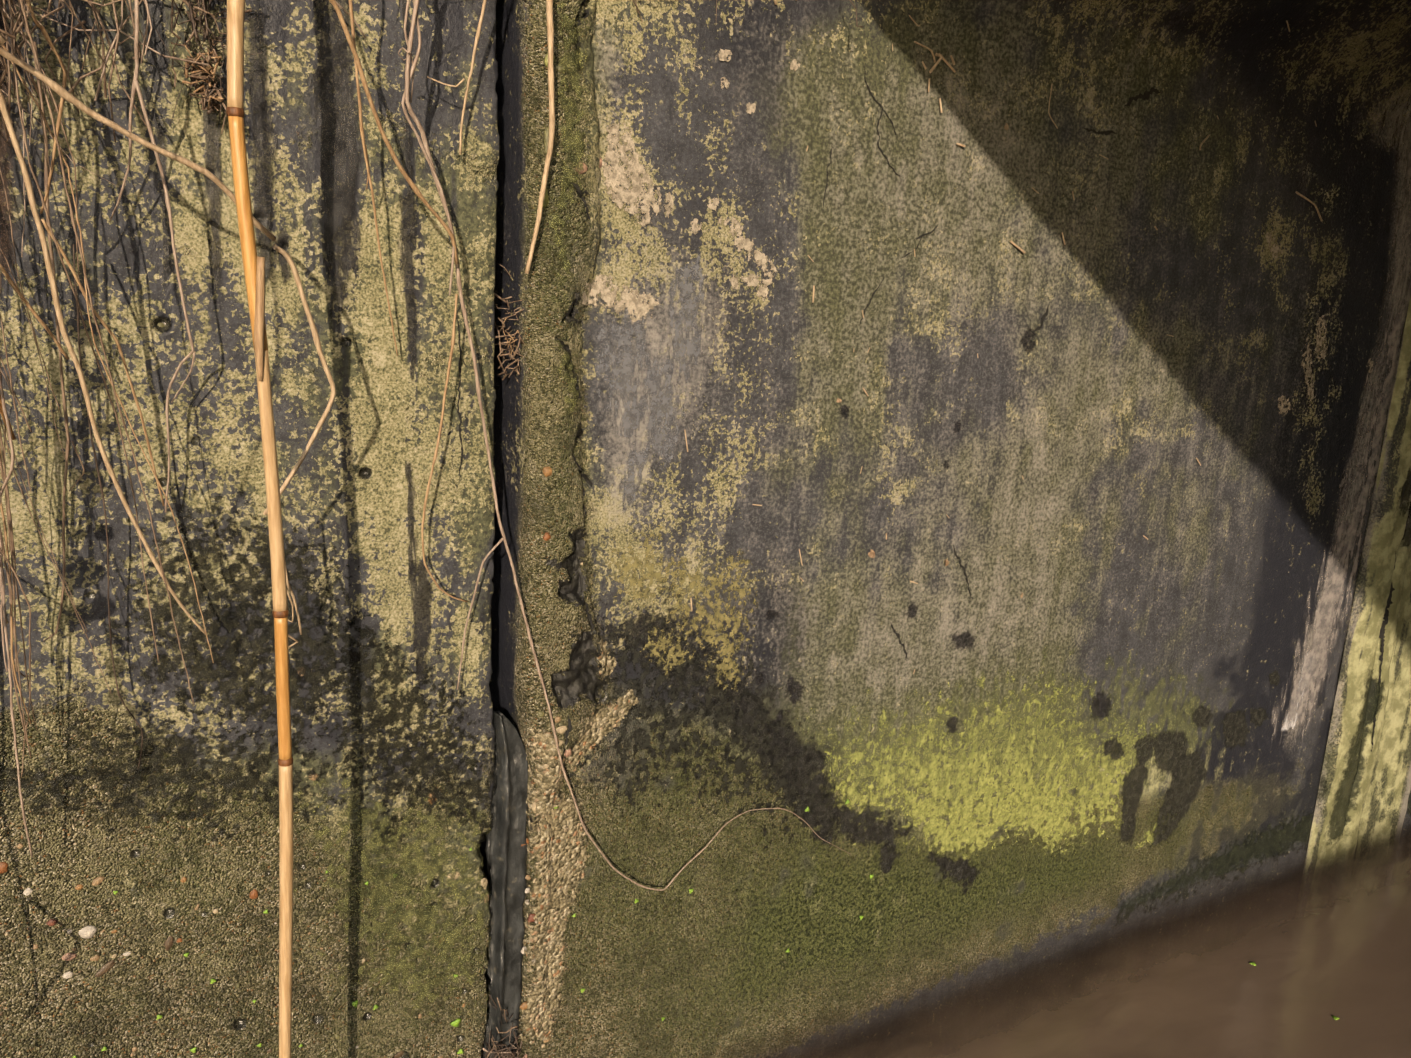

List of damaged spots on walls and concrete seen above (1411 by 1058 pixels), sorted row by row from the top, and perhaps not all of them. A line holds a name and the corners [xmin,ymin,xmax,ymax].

damp [154,118,174,286]
damp [200,71,222,309]
damp [246,8,290,283]
damp [313,0,361,321]
damp [398,0,417,380]
damp [1104,98,1411,846]
damp [0,463,497,854]
damp [566,589,913,873]
damp [927,852,980,894]
damp [952,631,975,649]
damp [1089,691,1112,720]
damp [1115,670,1385,926]